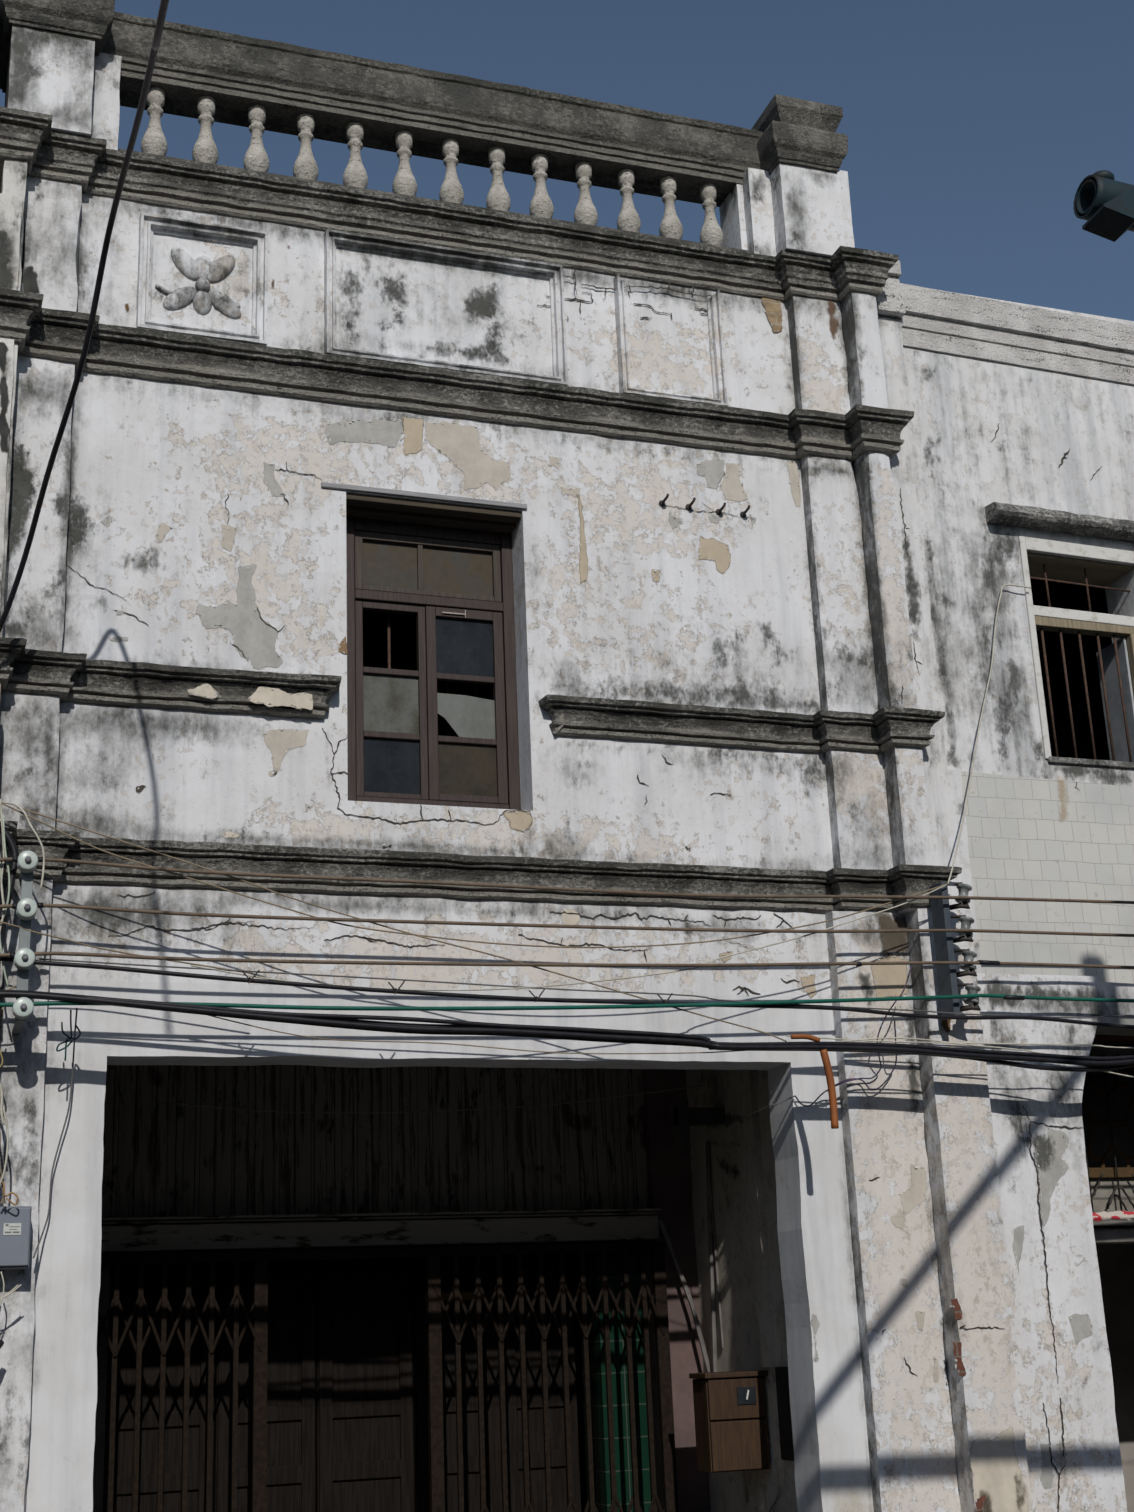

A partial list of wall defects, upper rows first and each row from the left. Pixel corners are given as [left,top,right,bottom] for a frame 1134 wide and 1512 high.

leakage [0,230,39,293]
leakage [343,271,406,337]
mould [428,283,509,363]
leakage [0,342,36,600]
flaking render [326,417,511,490]
flaking render [696,458,756,574]
flaking render [195,524,313,710]
flaking render [187,684,220,699]
leakage [999,659,1018,757]
crack [322,728,529,825]
crack [1023,1105,1083,1512]
flaking render [969,1427,1053,1512]